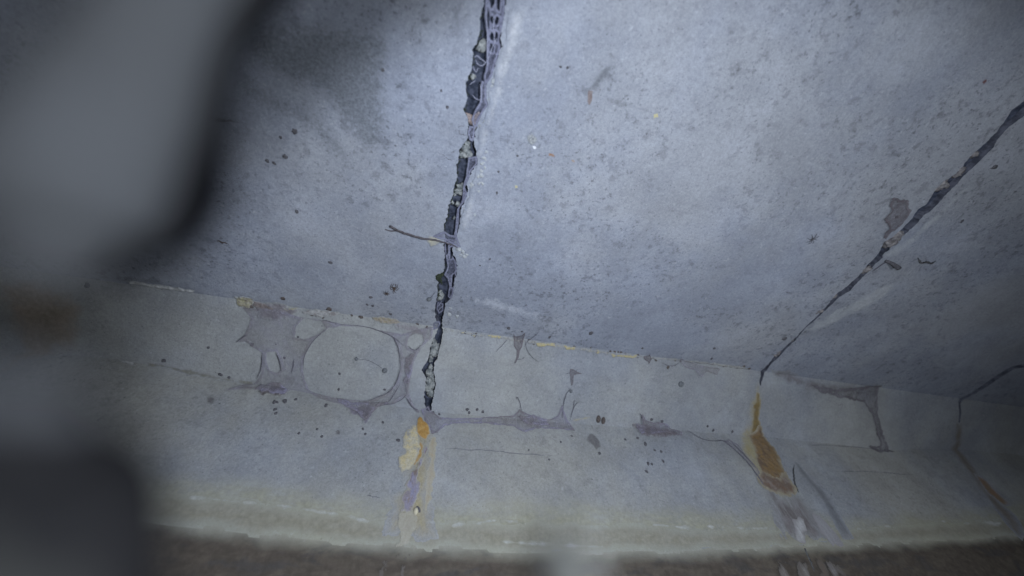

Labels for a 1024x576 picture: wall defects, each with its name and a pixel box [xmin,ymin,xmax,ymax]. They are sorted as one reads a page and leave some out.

crack [422,0,503,411]
crack [816,101,1024,314]
efflorescence [471,295,553,321]
rust [379,417,439,576]
rust [739,381,844,547]
rust [778,559,846,576]